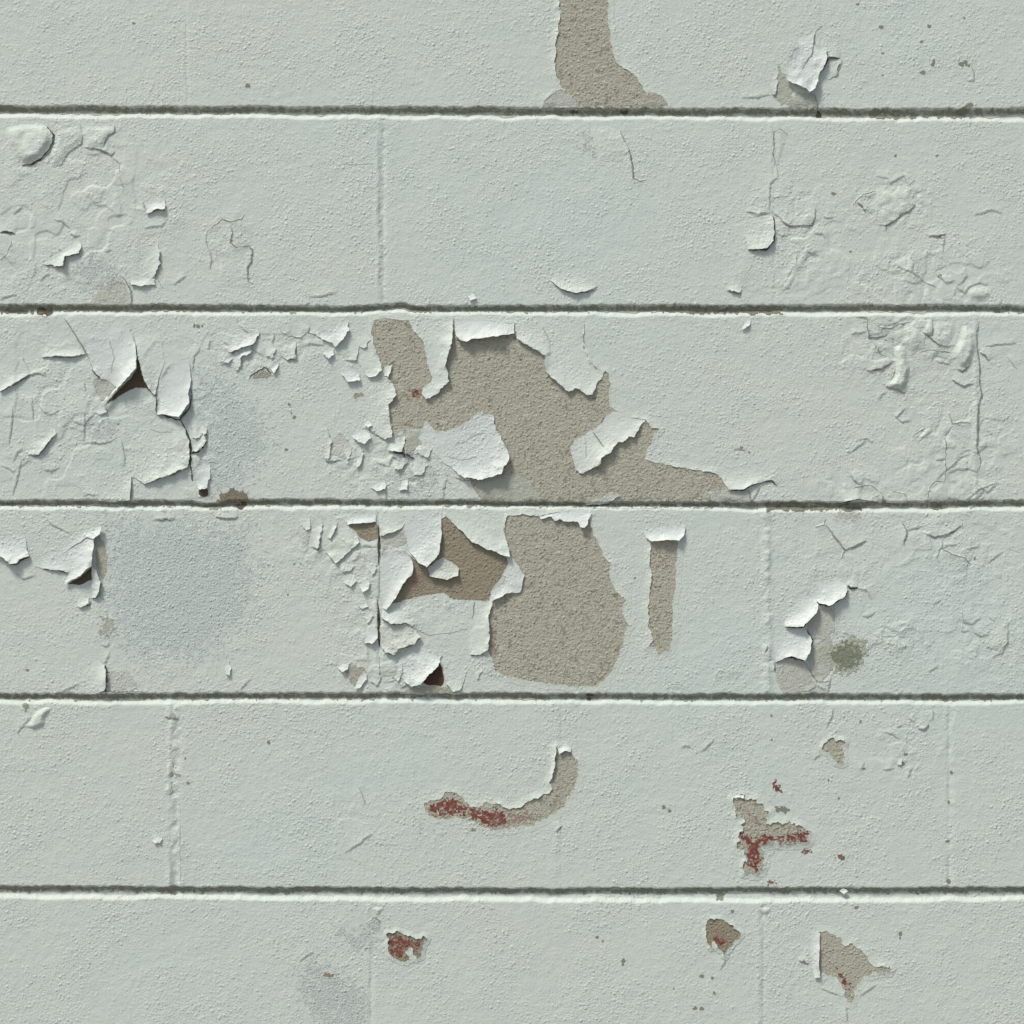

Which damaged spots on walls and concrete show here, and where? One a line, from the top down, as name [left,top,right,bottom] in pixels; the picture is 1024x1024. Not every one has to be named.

peeling [538,0,672,112]
crack [728,129,915,294]
crack [891,234,987,293]
peeling [95,357,151,415]
peeling [191,419,211,490]
crack [815,317,1016,563]
peeling [68,536,108,607]
peeling [299,511,405,549]
peeling [322,312,731,694]
peeling [418,741,585,836]
peeling [727,788,818,881]
peeling [803,925,897,1009]